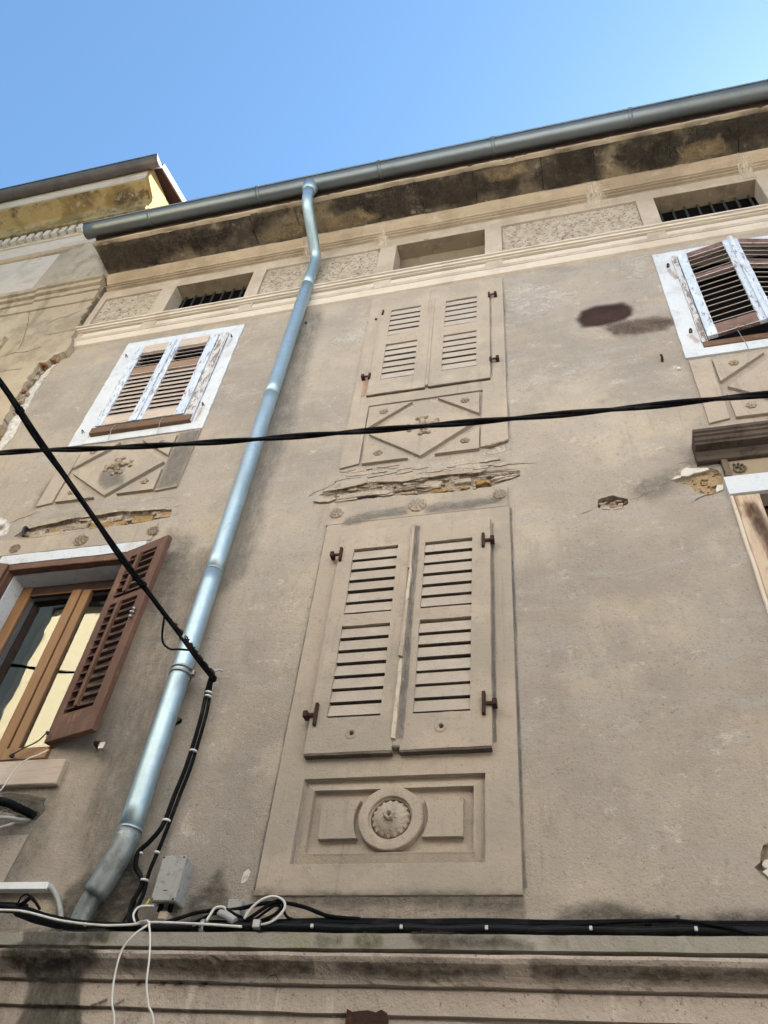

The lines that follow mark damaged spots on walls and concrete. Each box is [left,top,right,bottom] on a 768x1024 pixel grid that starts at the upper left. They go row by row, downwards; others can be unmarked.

water stain [99,227,230,270]
peeling [0,357,61,450]
spalling [313,440,521,503]
spalling [671,467,724,495]
spalling [598,499,628,510]
spalling [0,506,172,538]
water stain [1,862,140,1024]
water stain [152,957,311,977]
water stain [346,961,485,979]